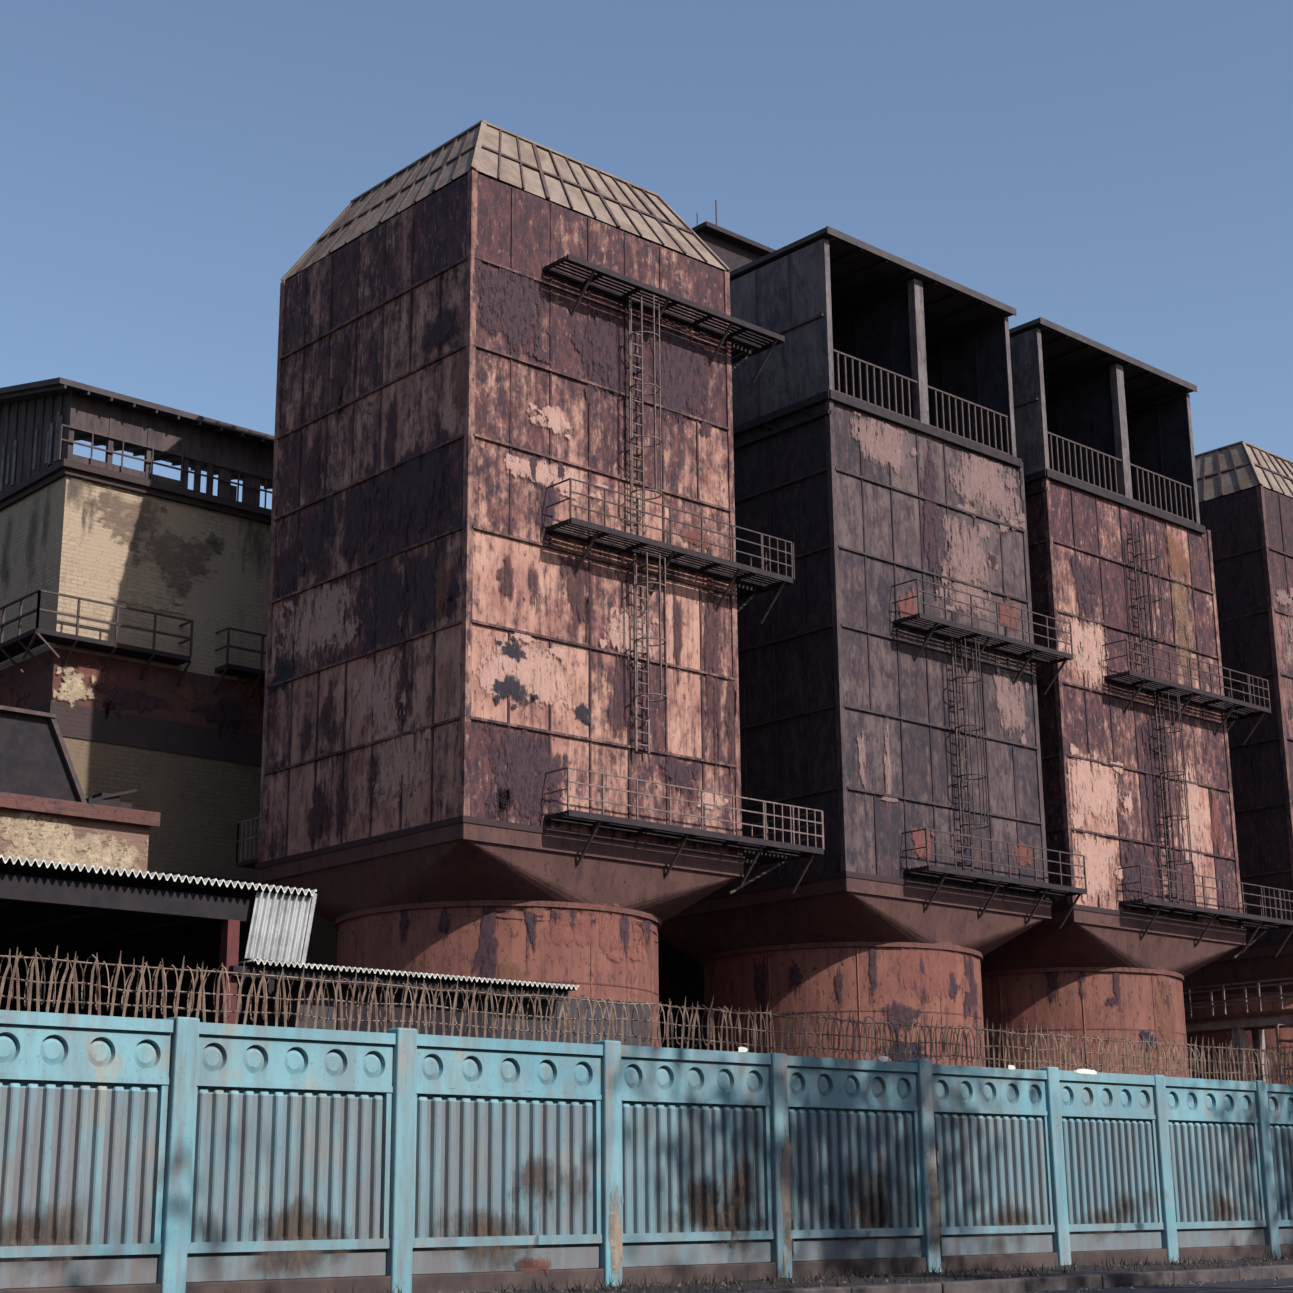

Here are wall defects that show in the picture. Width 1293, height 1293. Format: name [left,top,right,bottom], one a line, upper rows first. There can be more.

corrosion [420,308,468,413]
corrosion [497,555,540,611]
corrosion [561,550,591,649]
corrosion [1072,554,1099,636]
corrosion [395,655,412,730]
corrosion [608,652,644,764]
corrosion [659,575,736,805]
spalling [0,812,148,872]
corrosion [307,782,347,849]
corrosion [1123,712,1171,900]
corrosion [438,902,605,981]
corrosion [620,907,659,956]